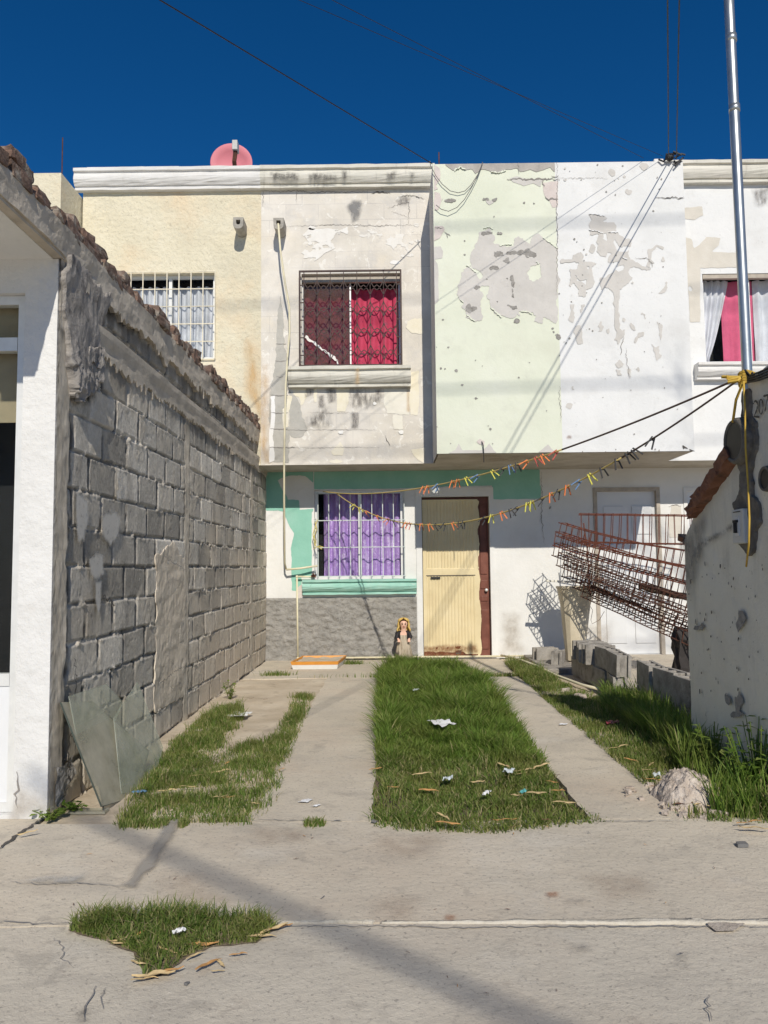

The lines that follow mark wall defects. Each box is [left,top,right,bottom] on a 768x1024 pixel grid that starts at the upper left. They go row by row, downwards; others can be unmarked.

leakage [273,172,346,180]
leakage [349,201,360,220]
peeling [685,206,703,220]
peeling [302,223,445,304]
peeling [457,198,665,360]
peeling [686,237,737,322]
spalling [725,667,749,718]
crack [0,772,42,848]
crack [84,986,104,1018]